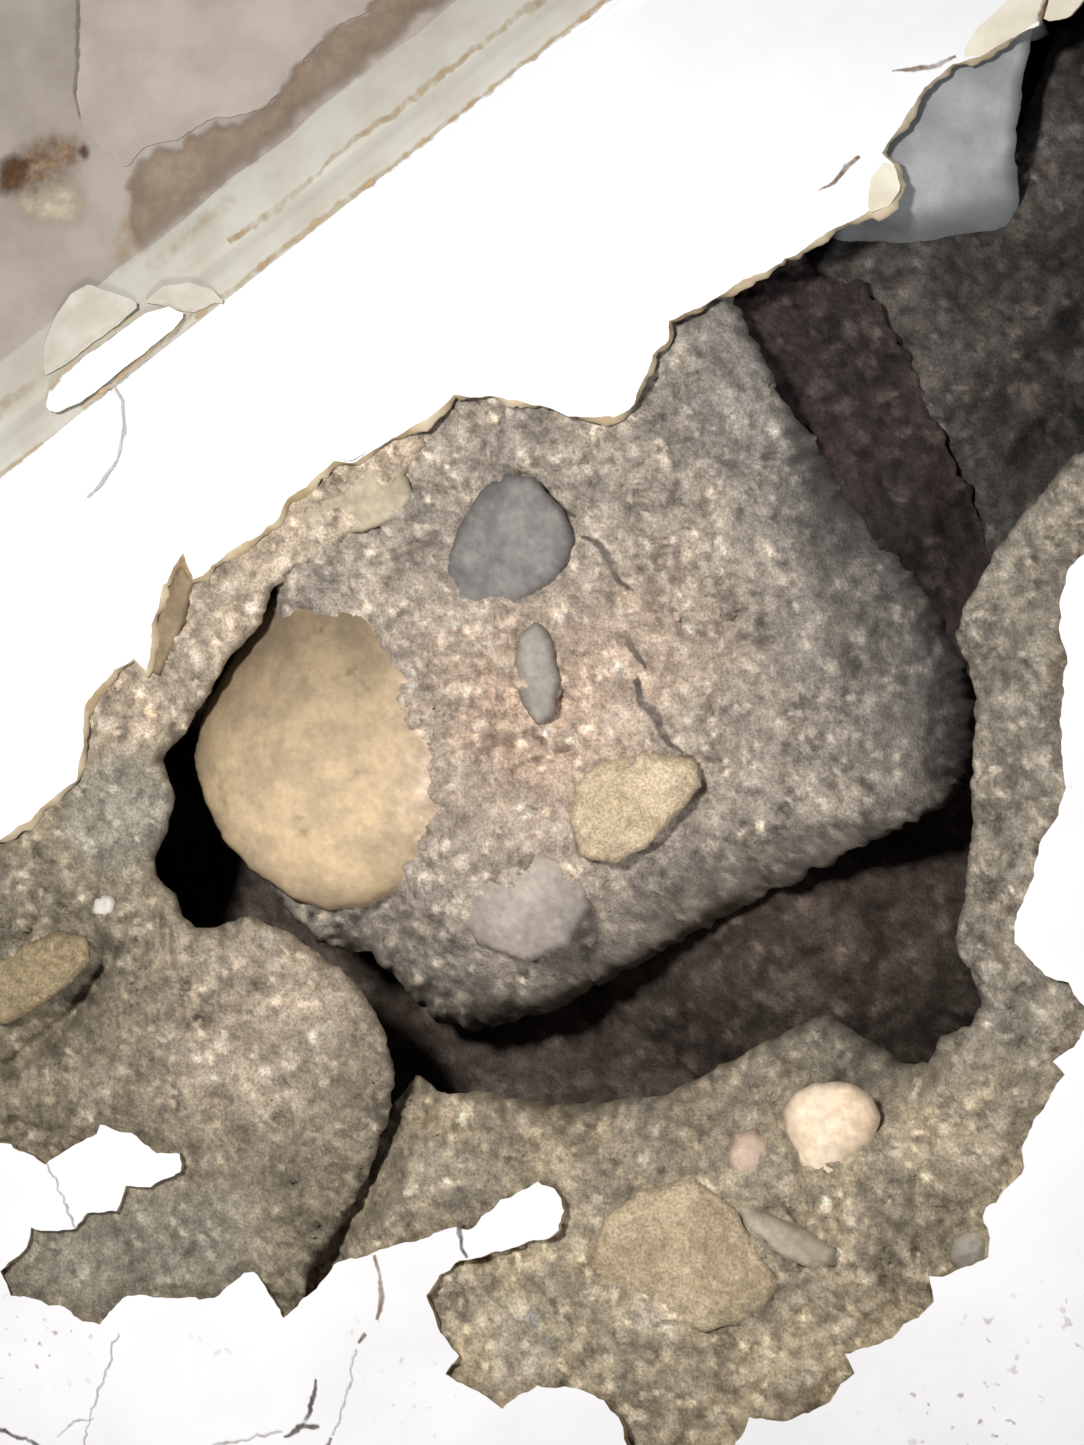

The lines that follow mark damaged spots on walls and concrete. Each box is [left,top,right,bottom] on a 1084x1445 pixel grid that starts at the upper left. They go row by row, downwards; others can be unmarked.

peeling [73,0,442,240]
spalling [0,282,981,1324]
spalling [305,0,1084,1445]
crack [46,1162,75,1228]
crack [457,1221,468,1258]
crack [0,1335,119,1445]
crack [213,1255,384,1445]